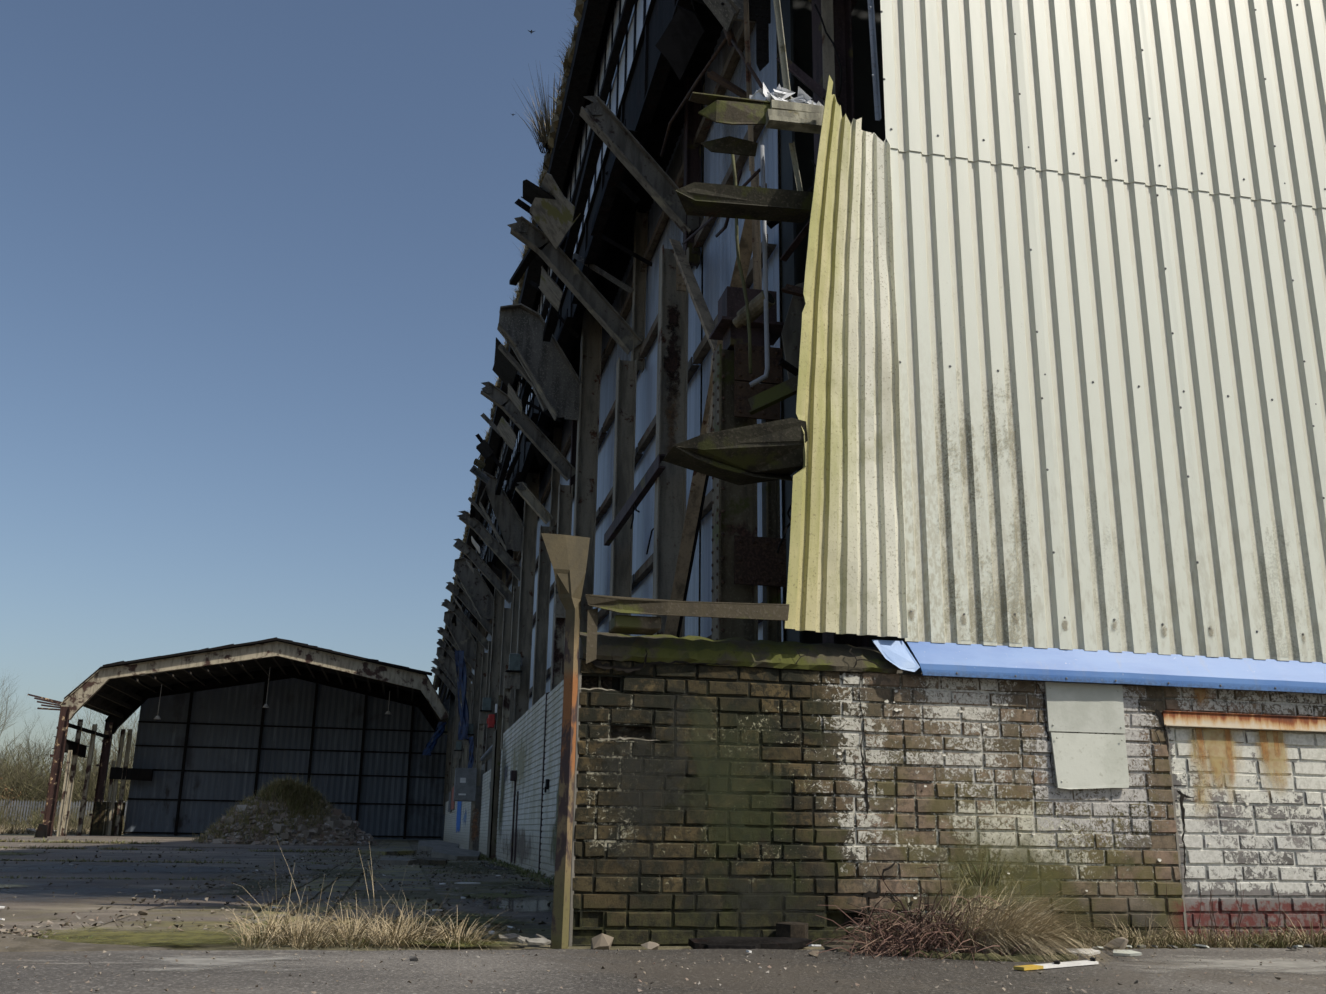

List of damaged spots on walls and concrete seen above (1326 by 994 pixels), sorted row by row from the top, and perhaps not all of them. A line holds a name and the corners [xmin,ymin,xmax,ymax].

leakage [936,376,1031,643]
leakage [572,658,877,946]
crack [854,674,876,818]
peeling [579,673,1326,929]
crack [1155,709,1169,753]
crack [1177,790,1193,886]
corrosion [1194,728,1236,802]
corrosion [1259,730,1287,785]